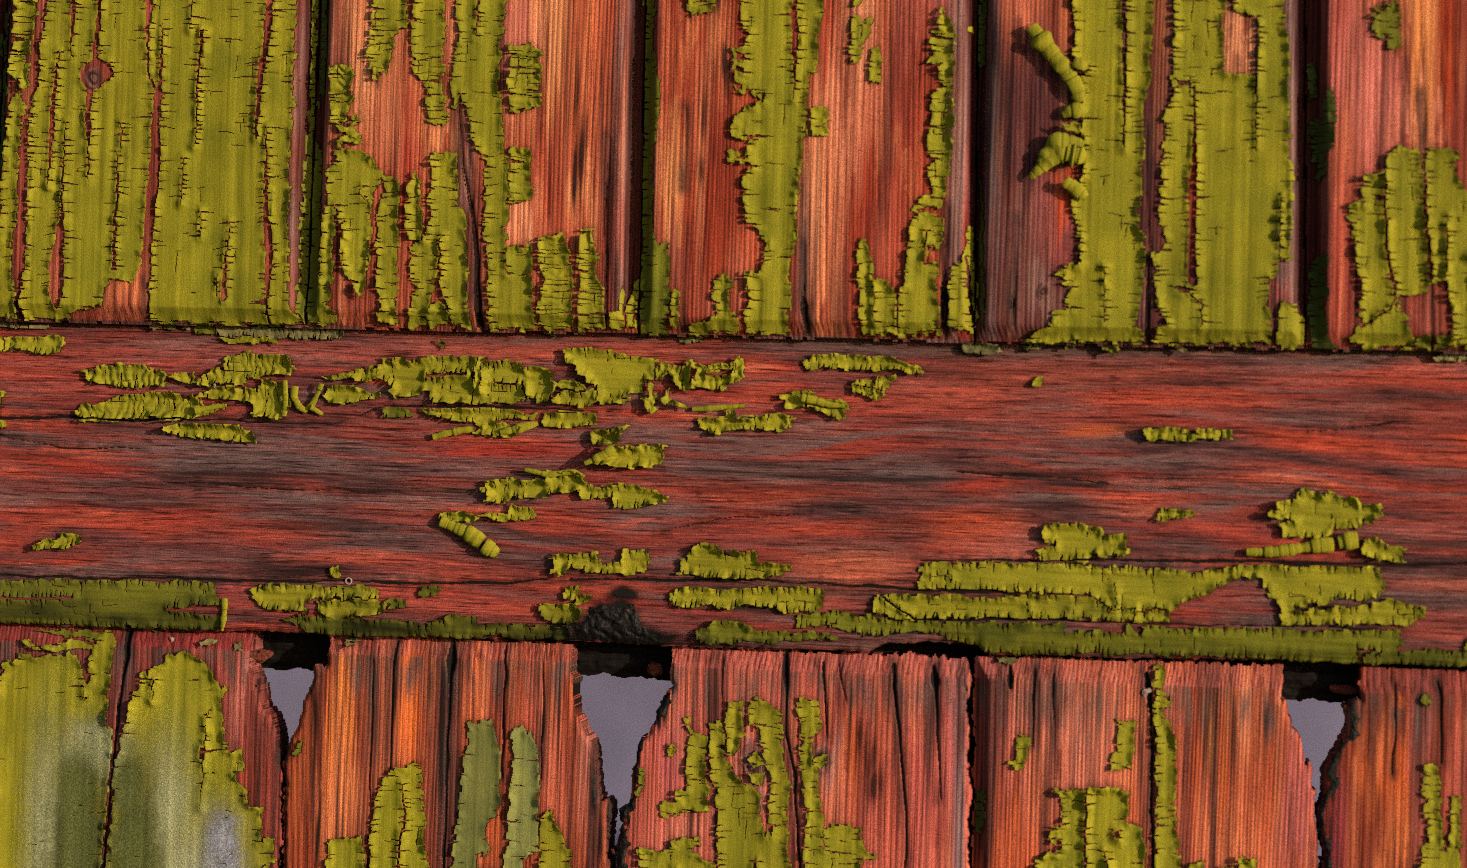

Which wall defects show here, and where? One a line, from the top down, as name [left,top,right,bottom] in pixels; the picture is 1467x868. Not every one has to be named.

peeling [0,0,924,558]
peeling [856,0,1002,355]
peeling [1021,0,1467,362]
peeling [1143,426,1233,442]
peeling [0,578,277,868]
peeling [325,761,430,868]
peeling [250,548,651,648]
peeling [450,719,573,868]
peeling [634,768,646,797]
peeling [636,487,1467,868]